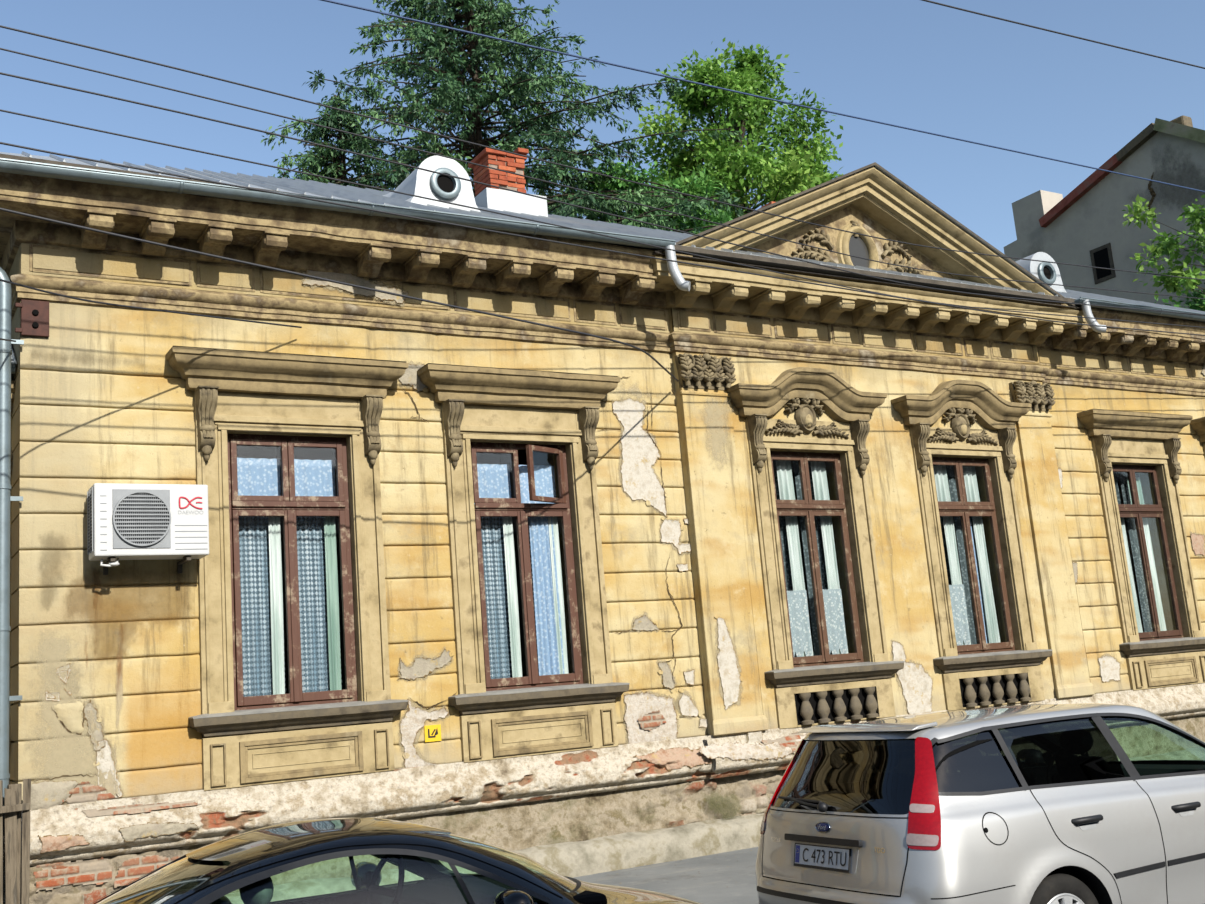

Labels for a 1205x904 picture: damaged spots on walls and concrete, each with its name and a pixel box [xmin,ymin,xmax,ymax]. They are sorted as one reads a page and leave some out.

peeling [612,398,691,572]
flaking render [33,669,202,892]
flaking render [399,699,449,768]
flaking render [398,649,455,680]
flaking render [630,612,660,632]
flaking render [624,661,808,771]
peeling [715,615,743,710]
flaking render [891,641,933,714]